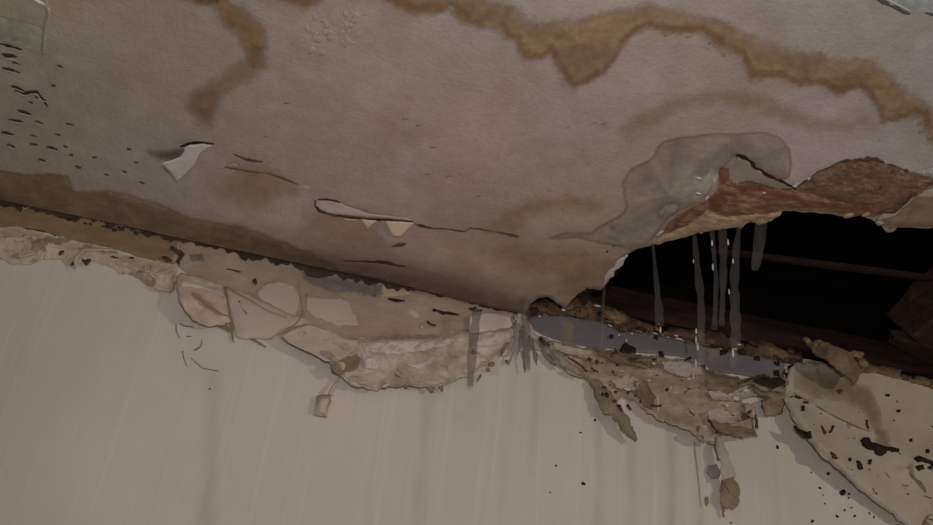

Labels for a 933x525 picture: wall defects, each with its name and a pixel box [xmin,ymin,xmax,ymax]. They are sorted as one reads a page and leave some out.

water stain [191,0,266,91]
water stain [389,0,933,141]
peeling [155,141,214,182]
crack [225,154,298,185]
flaking render [706,154,933,233]
crack [0,198,519,335]
flaking render [0,205,933,390]